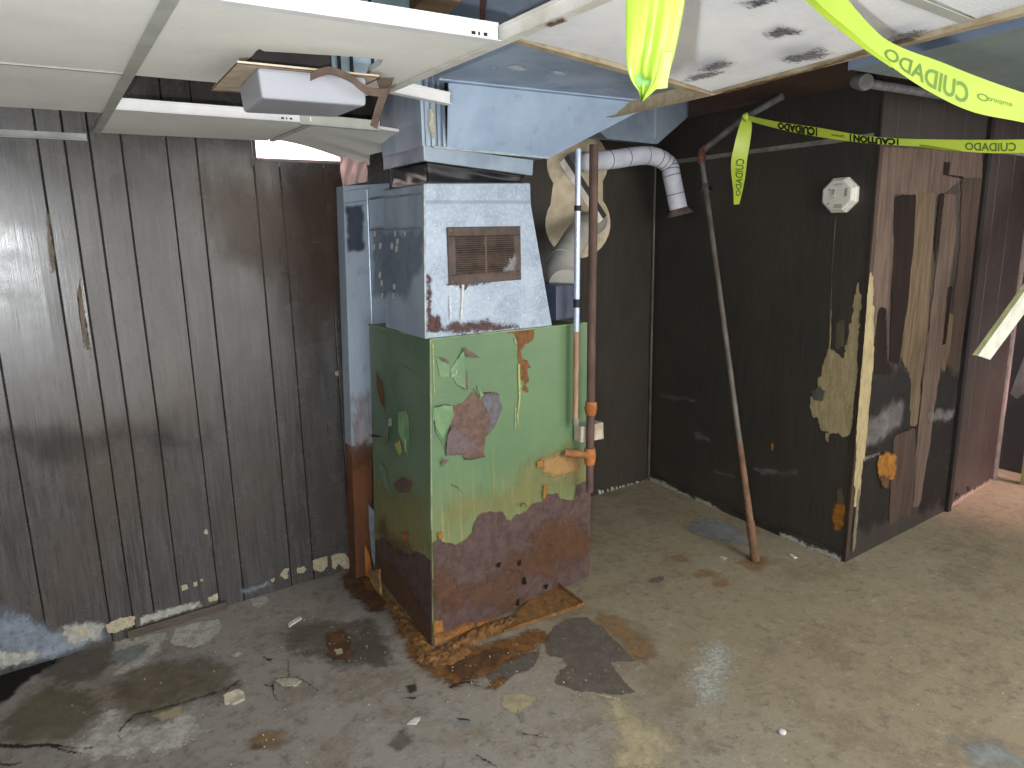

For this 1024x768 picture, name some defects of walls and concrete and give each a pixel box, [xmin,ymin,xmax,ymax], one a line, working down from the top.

damp [685,61,733,81]
damp [765,27,799,38]
damp [783,48,828,64]
peeling [810,282,862,442]
corrosion [877,452,897,488]
corrosion [832,486,845,530]
peeling [242,553,350,608]
corrosion [342,442,591,689]
damp [0,607,104,669]
spalling [106,593,223,676]
damp [486,617,636,695]
crack [117,680,240,737]